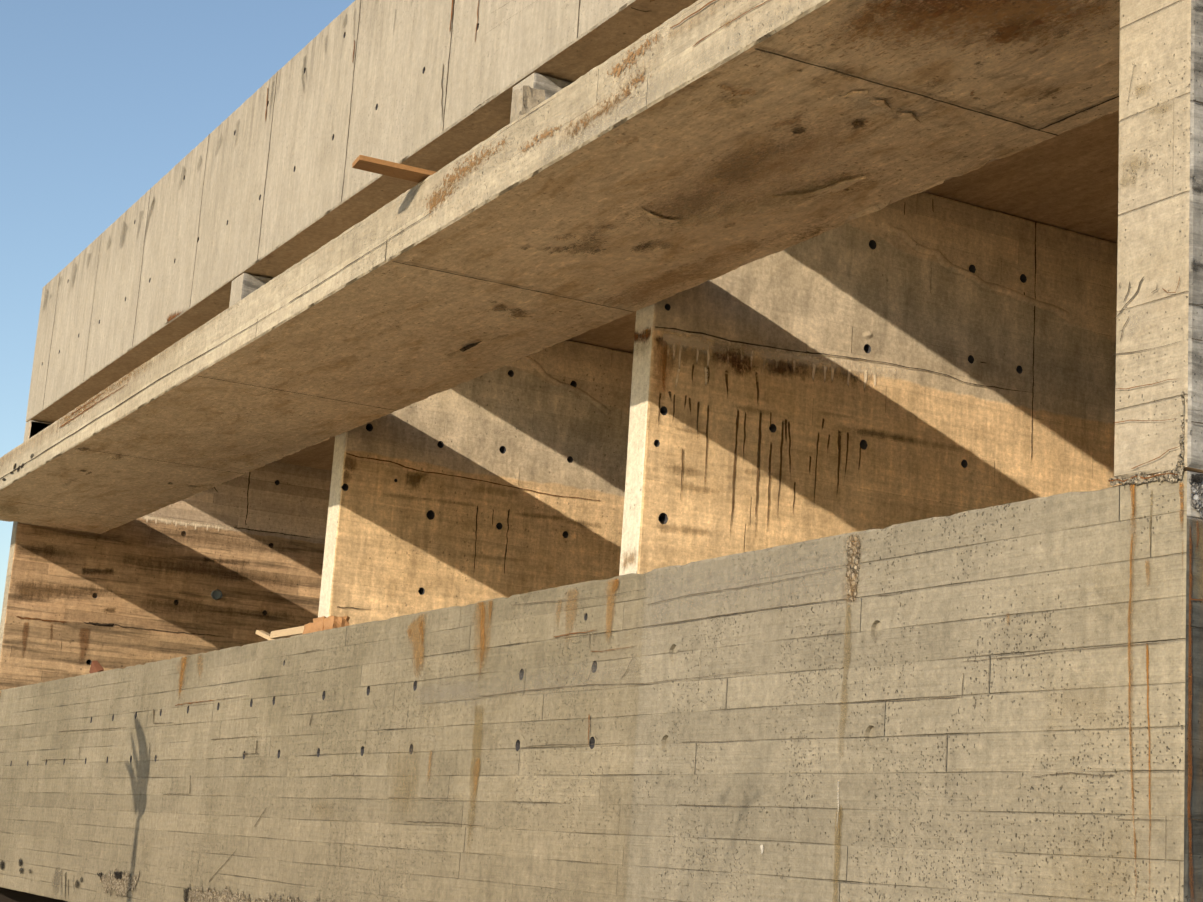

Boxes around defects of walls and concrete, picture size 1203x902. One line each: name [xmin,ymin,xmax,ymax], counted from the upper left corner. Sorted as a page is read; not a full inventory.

leakage [658,334,895,526]
corrosion [1128,539,1151,860]